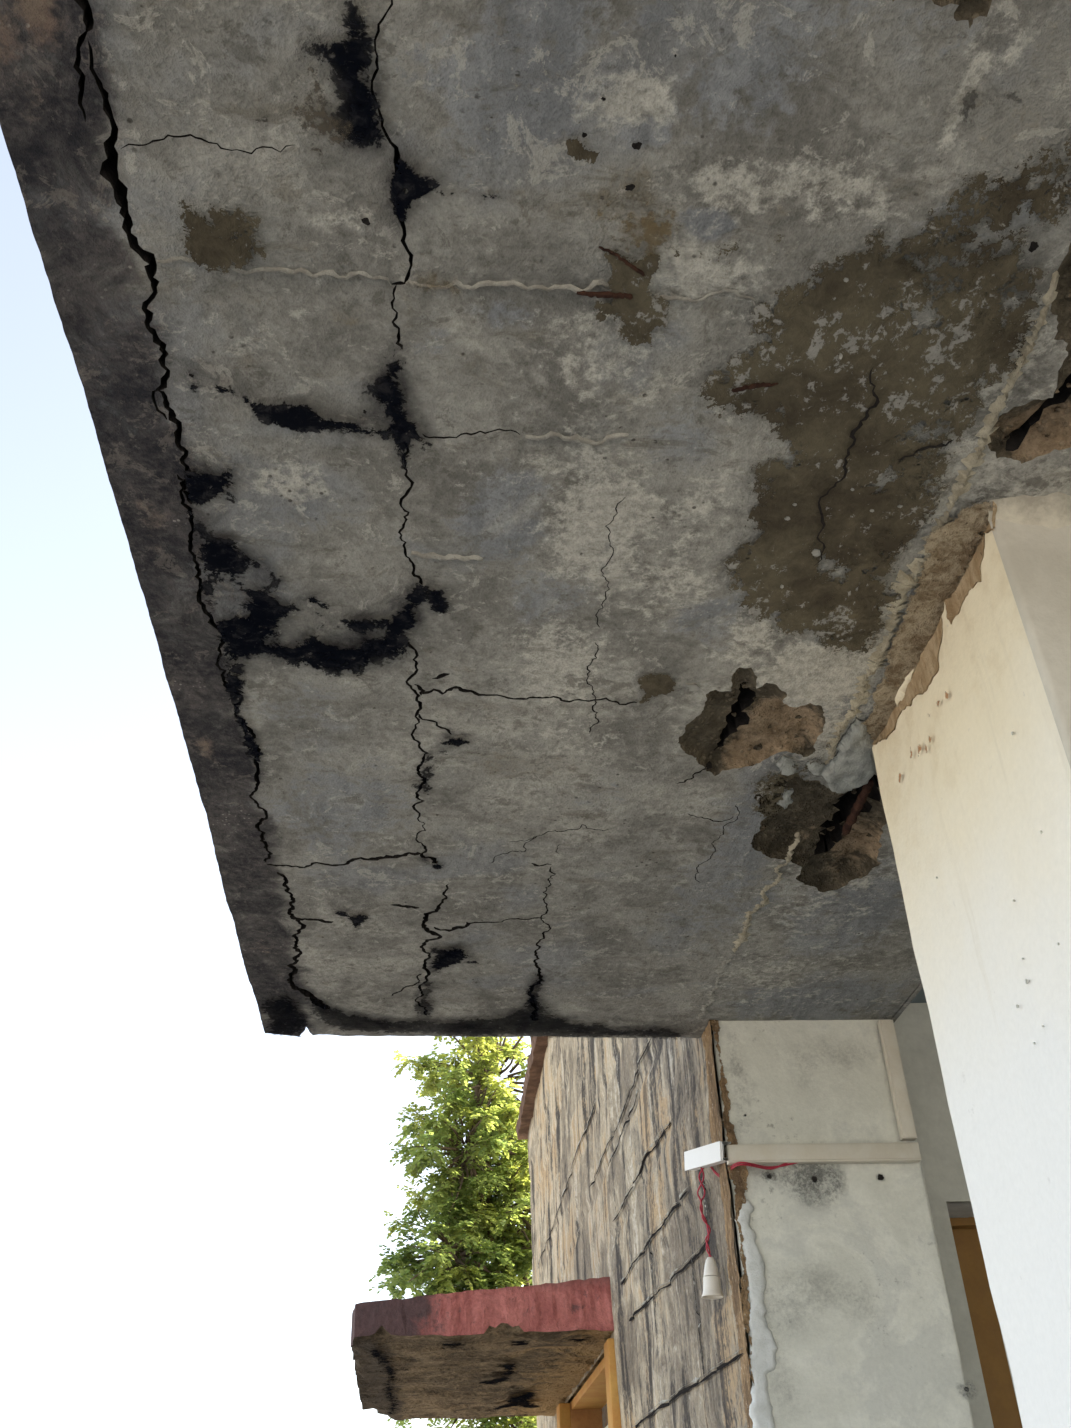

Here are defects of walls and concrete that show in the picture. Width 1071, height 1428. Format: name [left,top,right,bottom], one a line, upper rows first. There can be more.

leakage [290,0,386,155]
spalling [932,0,992,28]
leakage [388,158,454,222]
peeling [577,240,742,347]
leakage [215,349,432,470]
crack [73,0,637,1016]
peeling [698,119,1071,745]
leakage [184,470,451,763]
spalling [637,667,887,892]